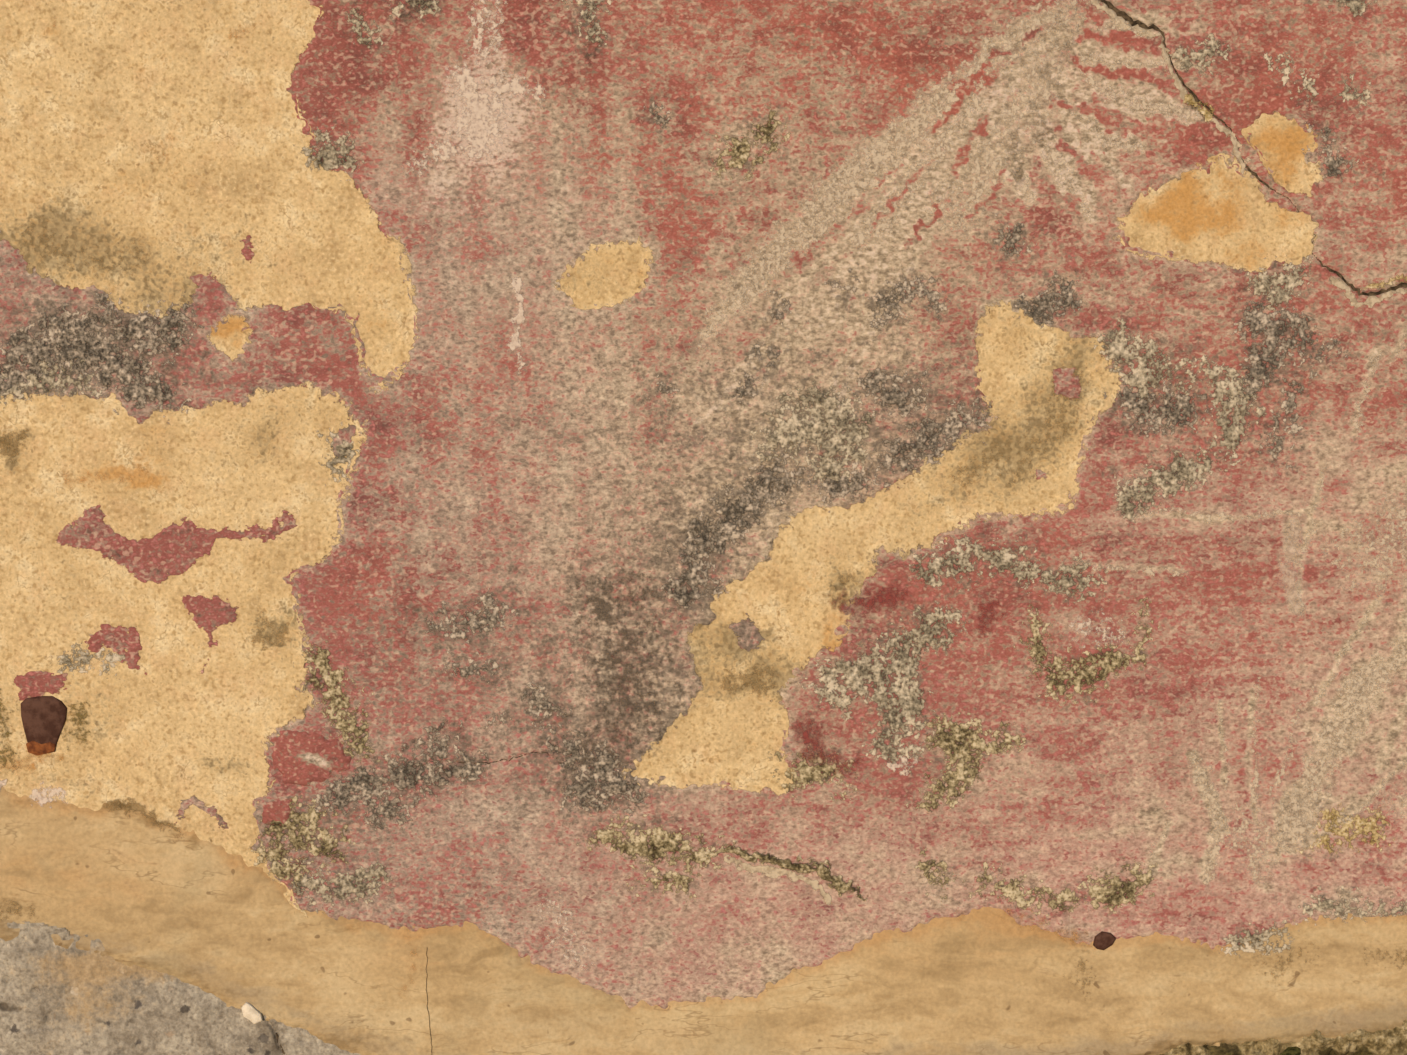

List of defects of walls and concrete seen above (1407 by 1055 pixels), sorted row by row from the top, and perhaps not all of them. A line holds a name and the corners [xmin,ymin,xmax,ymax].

spalling [0,0,418,393]
spalling [556,236,654,310]
spalling [1113,112,1323,277]
crack [1091,0,1407,308]
spalling [0,381,368,918]
spalling [622,300,1124,795]
peeling [241,1002,263,1024]